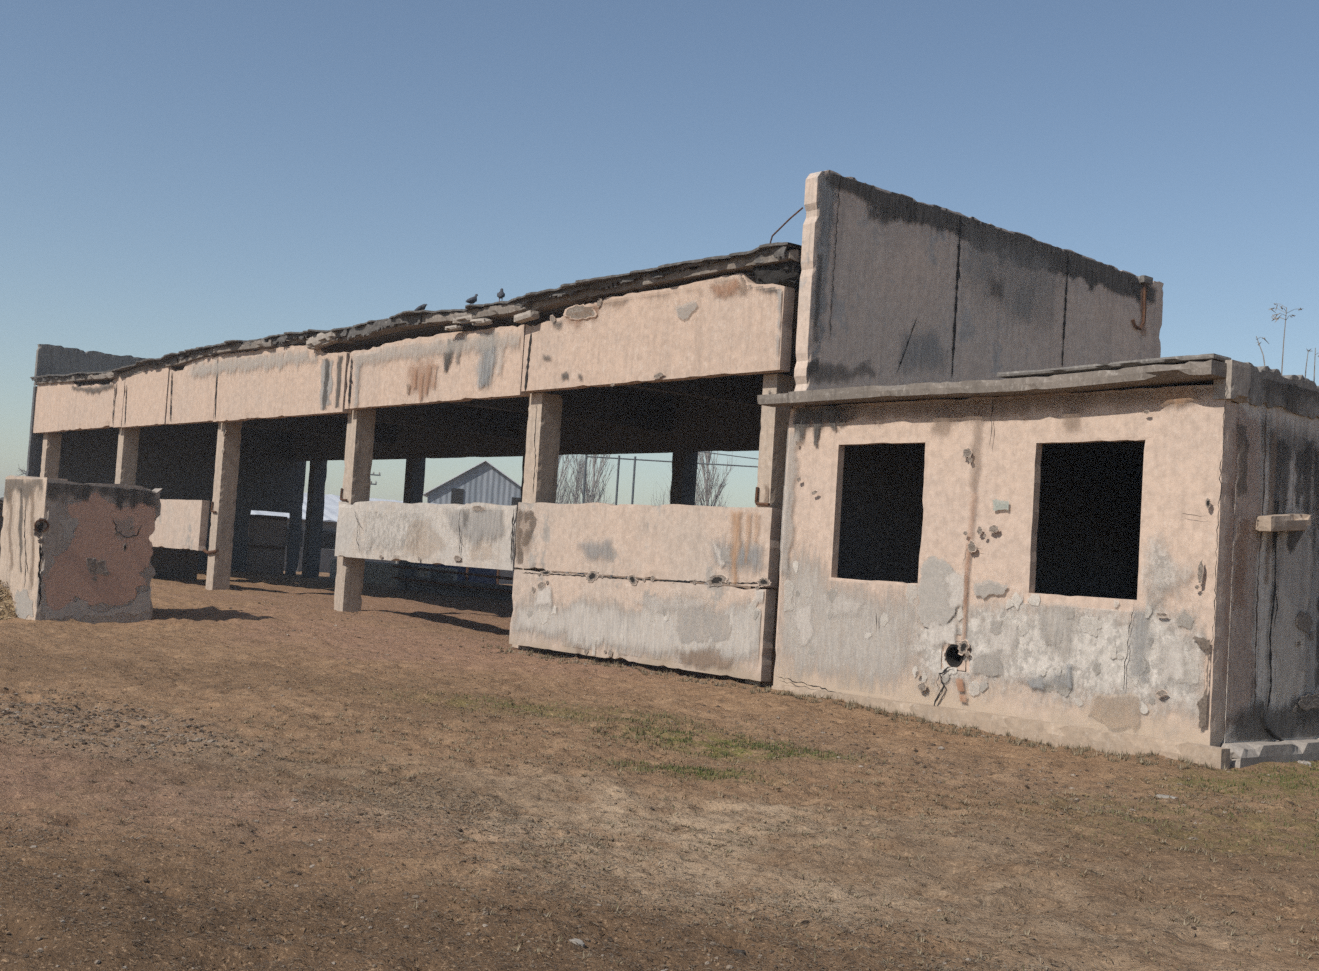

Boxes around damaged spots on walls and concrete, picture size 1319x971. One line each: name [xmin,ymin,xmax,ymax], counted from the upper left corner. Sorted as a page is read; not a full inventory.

water stain [807,170,1150,374]
corrosion [1133,282,1155,333]
water stain [1266,379,1319,413]
peeling [15,492,156,619]
peeling [512,433,1210,728]
water stain [1231,433,1319,741]